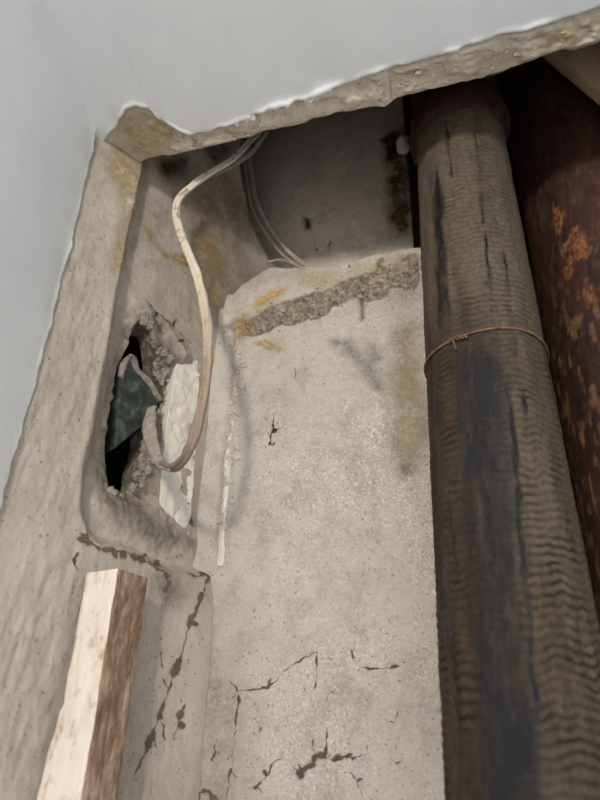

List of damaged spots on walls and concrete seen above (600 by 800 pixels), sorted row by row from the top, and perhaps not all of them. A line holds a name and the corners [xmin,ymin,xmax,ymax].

spalling [112,7,600,213]
spalling [246,253,419,336]
flaking render [105,312,200,535]
crack [72,533,210,776]
crack [198,651,318,800]
crack [252,729,368,797]
crack [351,649,399,670]